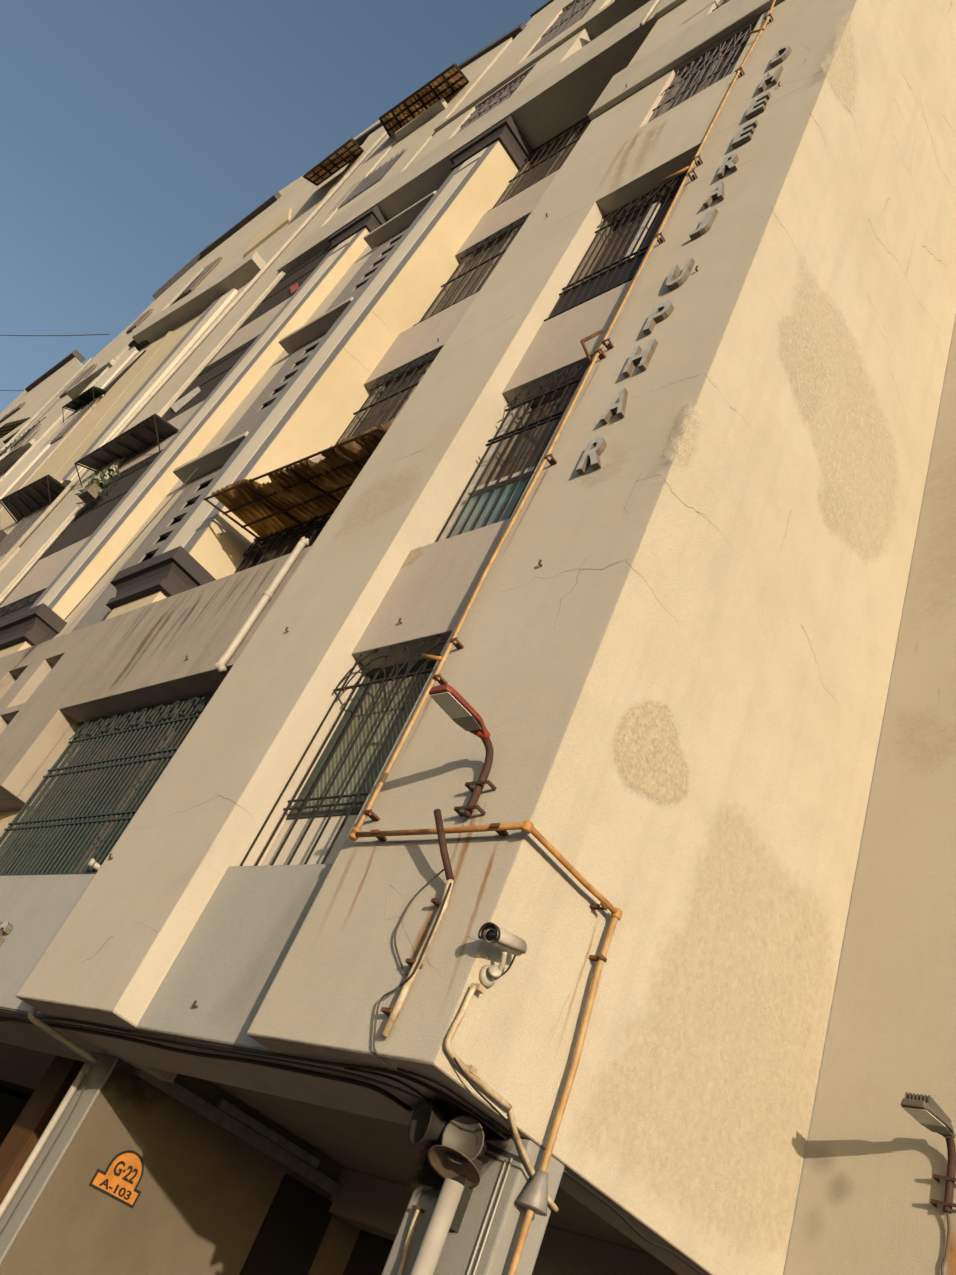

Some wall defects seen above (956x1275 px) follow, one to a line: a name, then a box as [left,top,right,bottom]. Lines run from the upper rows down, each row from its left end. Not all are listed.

corrosion [415,916,432,955]